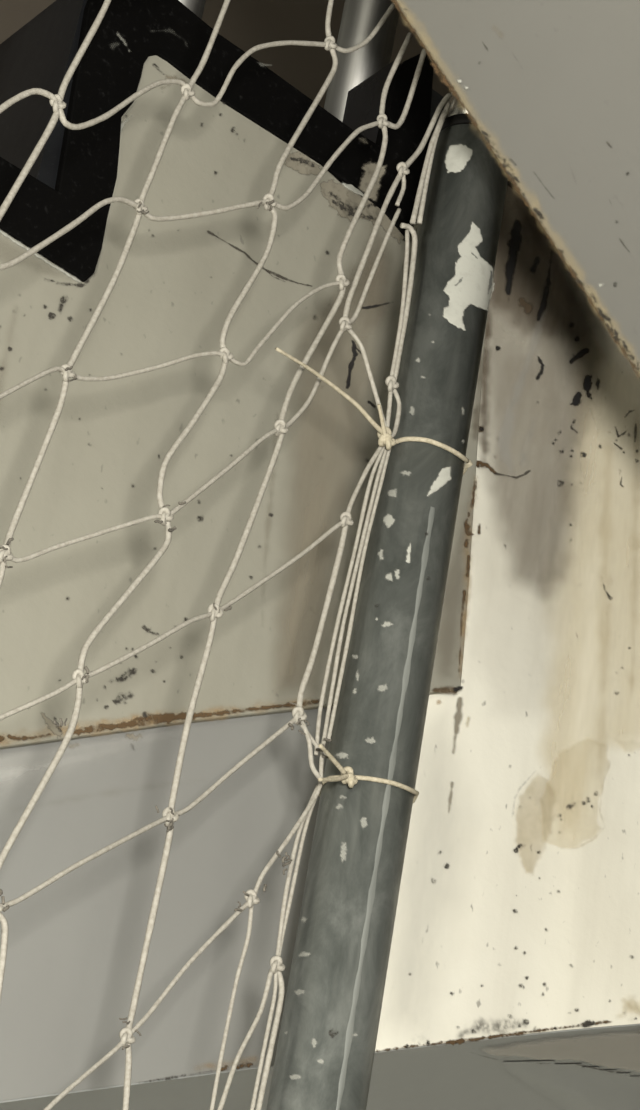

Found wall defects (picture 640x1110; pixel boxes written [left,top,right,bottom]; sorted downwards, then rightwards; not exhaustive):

crack [207,231,311,286]
water stain [494,156,579,332]
crack [476,461,530,478]
corrosion [73,700,320,735]
corrosion [0,733,51,741]